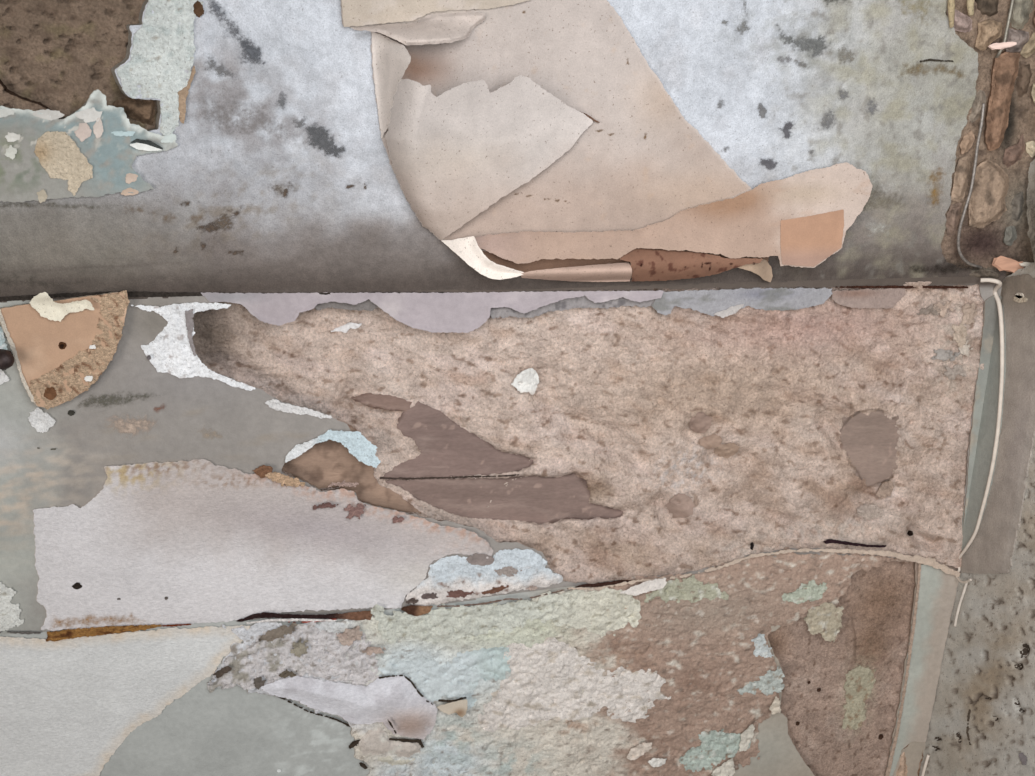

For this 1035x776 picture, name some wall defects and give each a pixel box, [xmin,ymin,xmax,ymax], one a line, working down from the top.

spalling [0,0,204,203]
spalling [941,0,1035,276]
spalling [131,281,984,776]
crack [823,539,886,548]